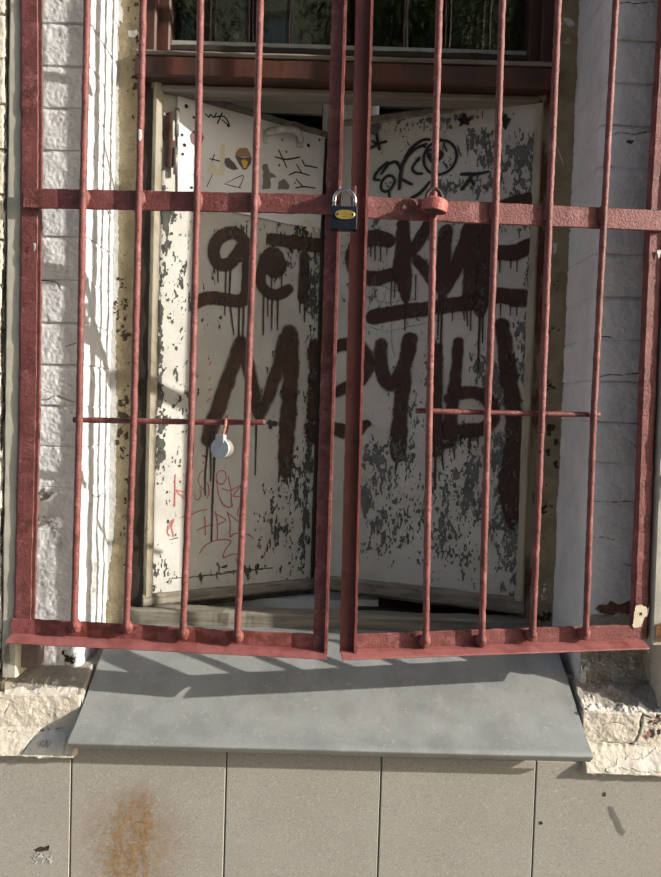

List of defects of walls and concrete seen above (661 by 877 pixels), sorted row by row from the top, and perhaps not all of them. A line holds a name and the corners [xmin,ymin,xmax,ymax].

flaking render [589,600,650,628]
peeling [57,650,80,681]
spalling [580,650,652,707]
spalling [636,714,661,739]